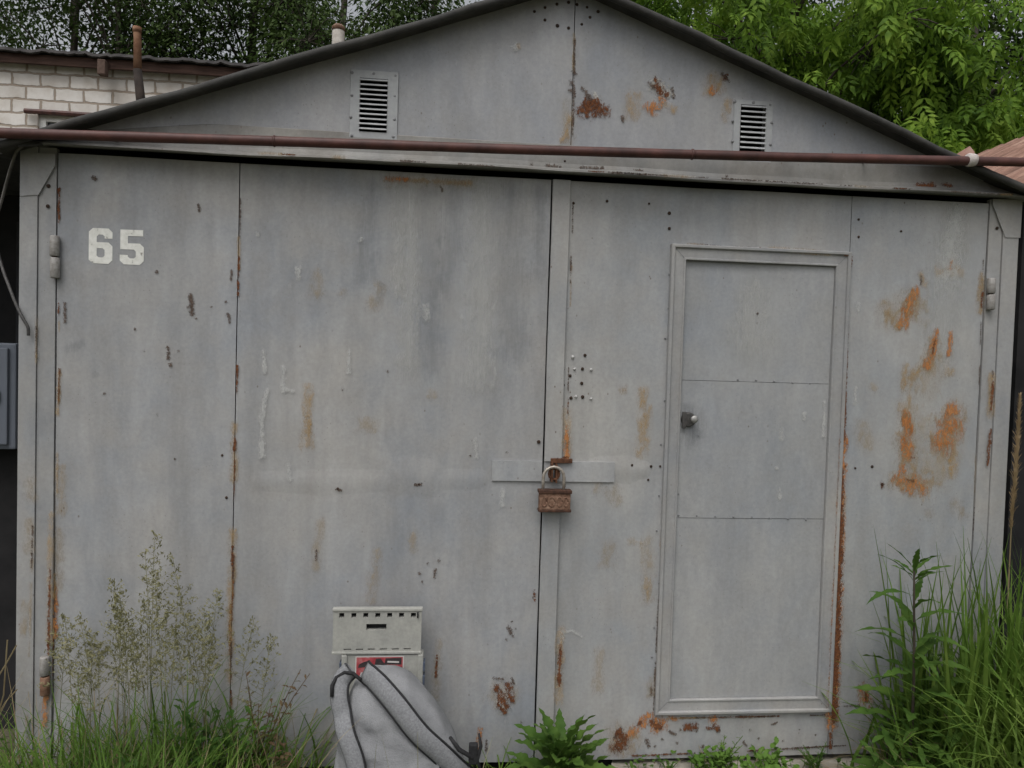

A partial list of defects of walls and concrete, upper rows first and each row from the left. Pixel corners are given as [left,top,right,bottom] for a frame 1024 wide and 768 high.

corrosion [562,38,625,141]
corrosion [886,274,924,329]
corrosion [904,328,953,385]
corrosion [881,404,928,495]
corrosion [932,401,964,476]
corrosion [747,355,849,752]
corrosion [46,563,59,676]
corrosion [228,529,236,718]
corrosion [492,677,515,714]
corrosion [609,594,779,757]